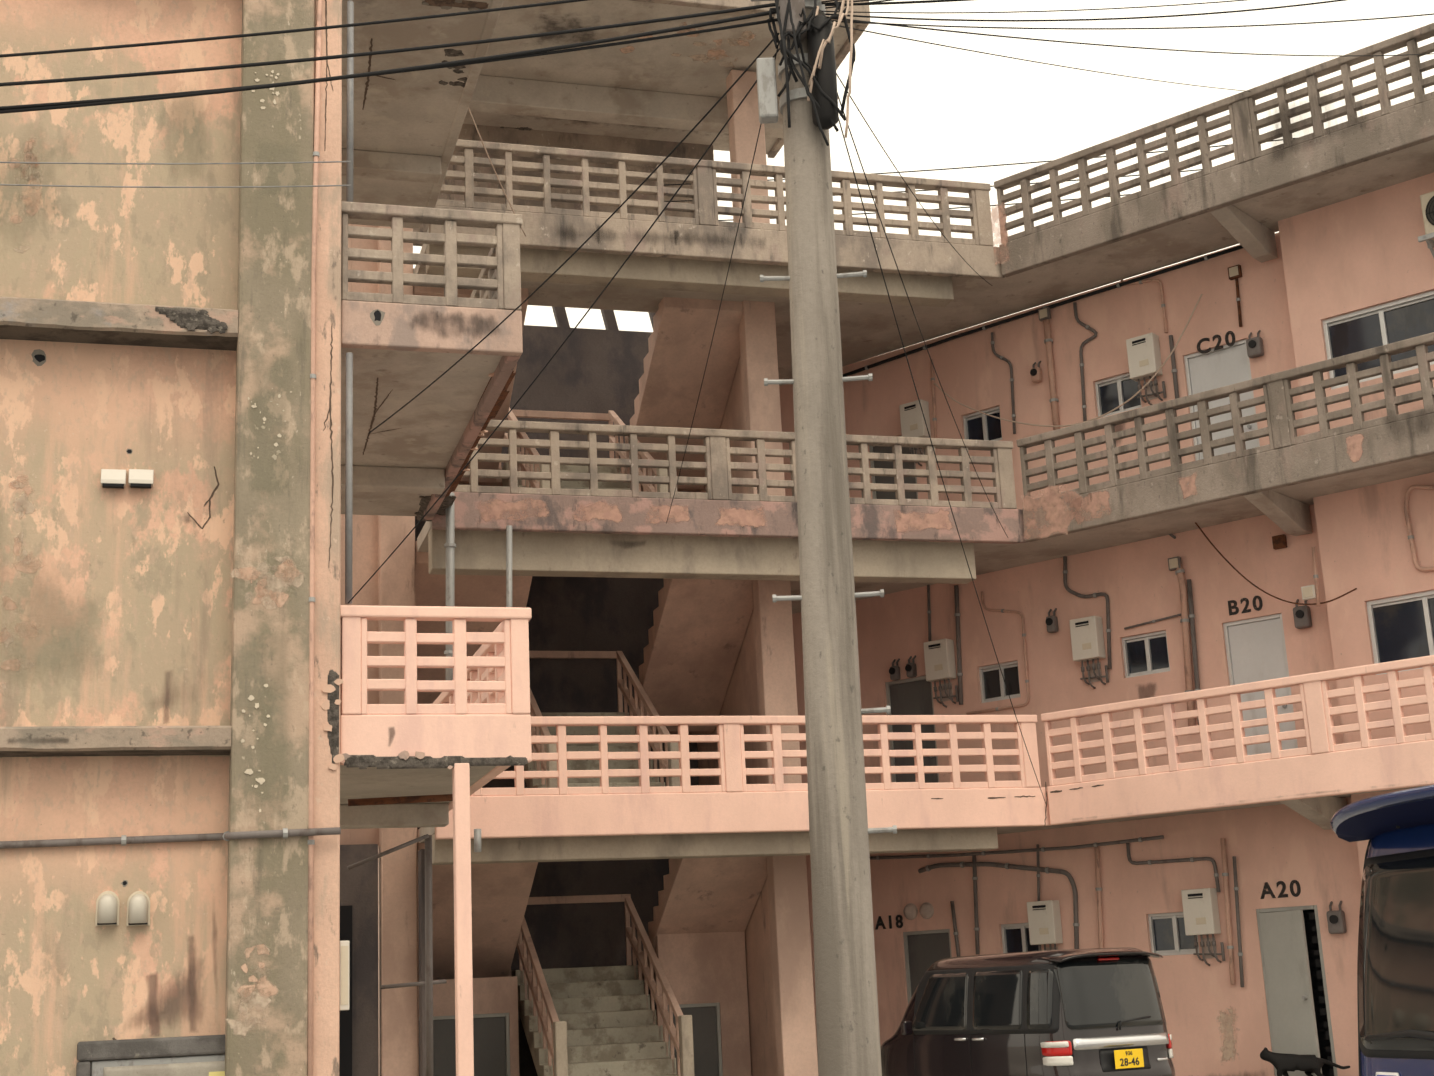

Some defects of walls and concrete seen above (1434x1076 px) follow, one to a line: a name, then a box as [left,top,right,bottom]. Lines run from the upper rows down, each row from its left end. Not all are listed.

spalling [155,307,228,334]
crack [187,466,220,529]
spalling [321,670,528,771]
leakage [150,966,194,1034]